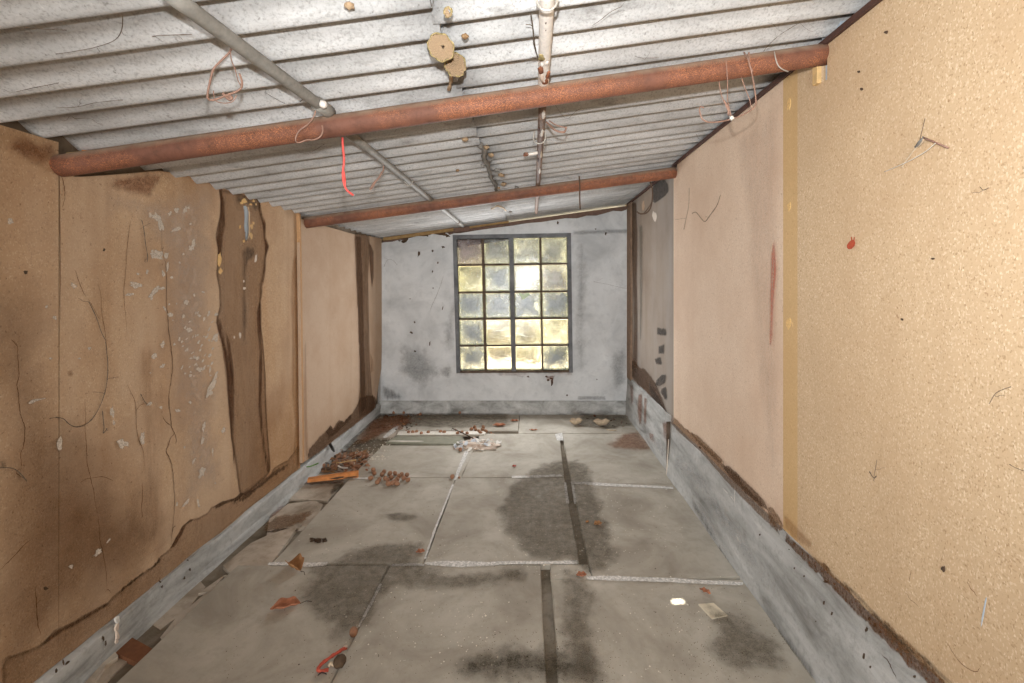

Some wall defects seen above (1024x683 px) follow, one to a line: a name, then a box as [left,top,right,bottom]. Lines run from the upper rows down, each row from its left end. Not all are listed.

crack [11,339,25,477]
crack [127,251,177,538]
damp [632,203,945,683]
damp [6,556,162,661]
peeling [316,645,348,673]
damp [302,451,743,674]